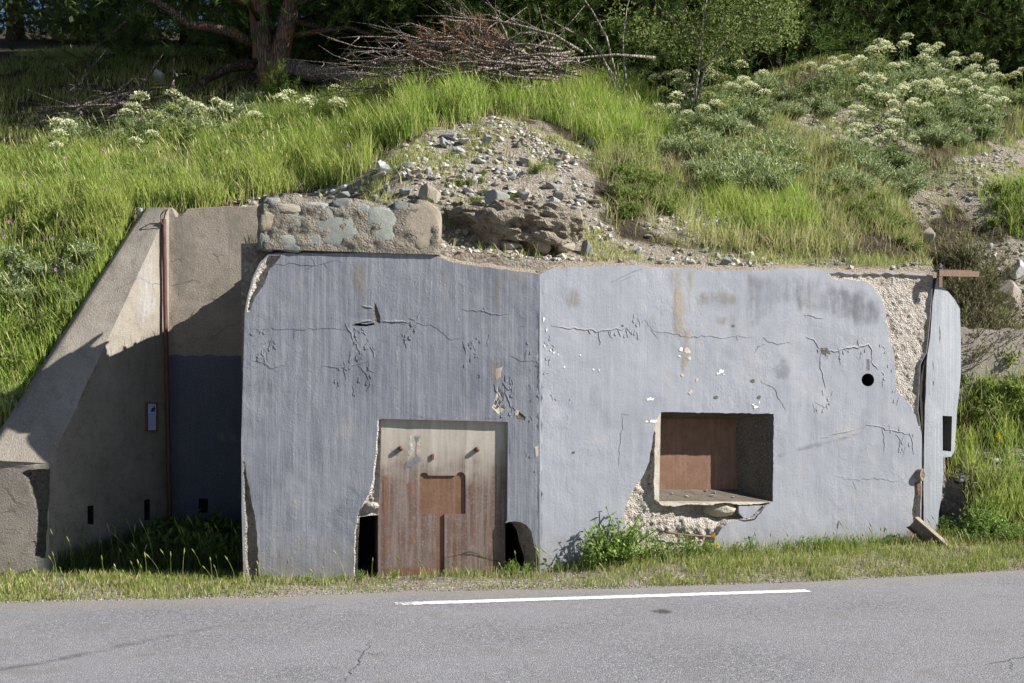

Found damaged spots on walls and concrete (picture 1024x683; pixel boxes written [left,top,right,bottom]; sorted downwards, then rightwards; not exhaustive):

spalling [247,255,282,312]
crack [189,304,460,369]
peeling [492,367,533,422]
crack [494,352,536,413]
crack [552,314,878,408]
spalling [827,272,933,432]
crack [823,280,940,467]
spalling [354,419,382,578]
spalling [624,419,771,559]